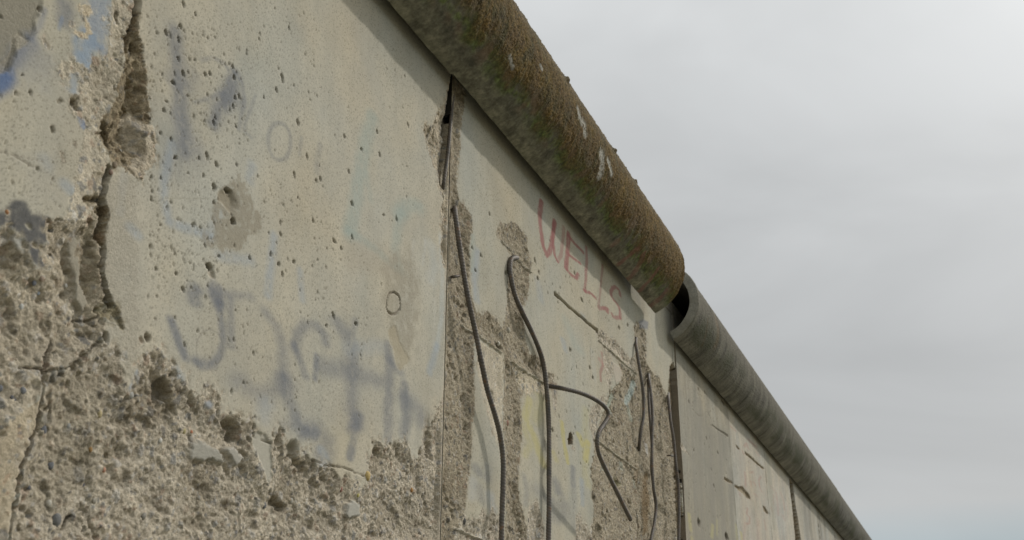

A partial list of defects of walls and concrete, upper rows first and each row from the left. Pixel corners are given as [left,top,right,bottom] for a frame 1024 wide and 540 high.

spalling [0,0,683,540]